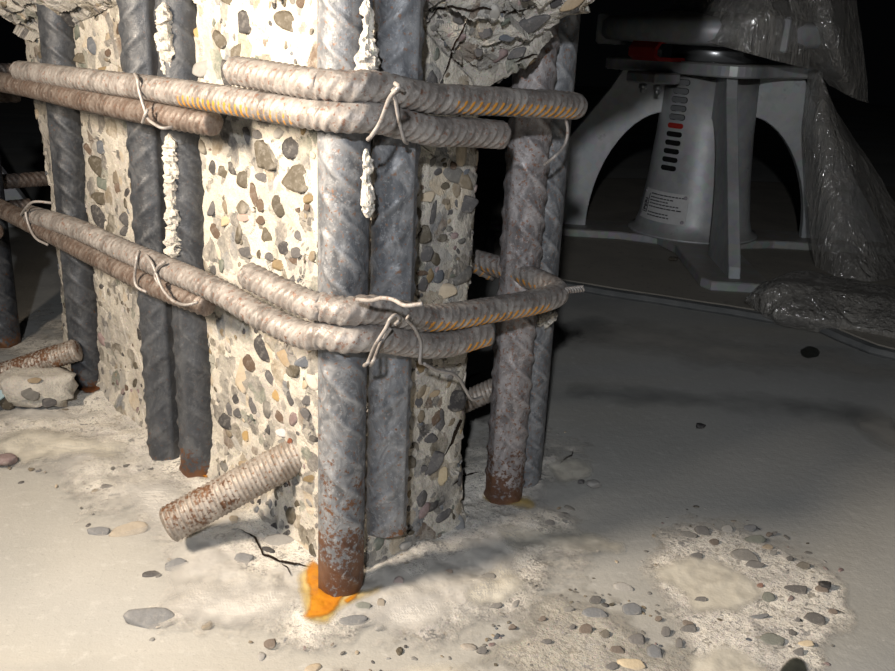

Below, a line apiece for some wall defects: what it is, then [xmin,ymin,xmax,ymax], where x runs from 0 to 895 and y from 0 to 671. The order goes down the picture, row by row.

spalling [0,0,123,72]
spalling [192,0,317,90]
crack [428,5,536,79]
spalling [422,0,594,86]
spalling [80,111,135,243]
spalling [198,113,318,322]
spalling [414,145,479,304]
spalling [93,267,147,429]
spalling [205,305,318,557]
spalling [364,352,468,571]
crack [240,529,309,574]
rust [301,562,365,621]